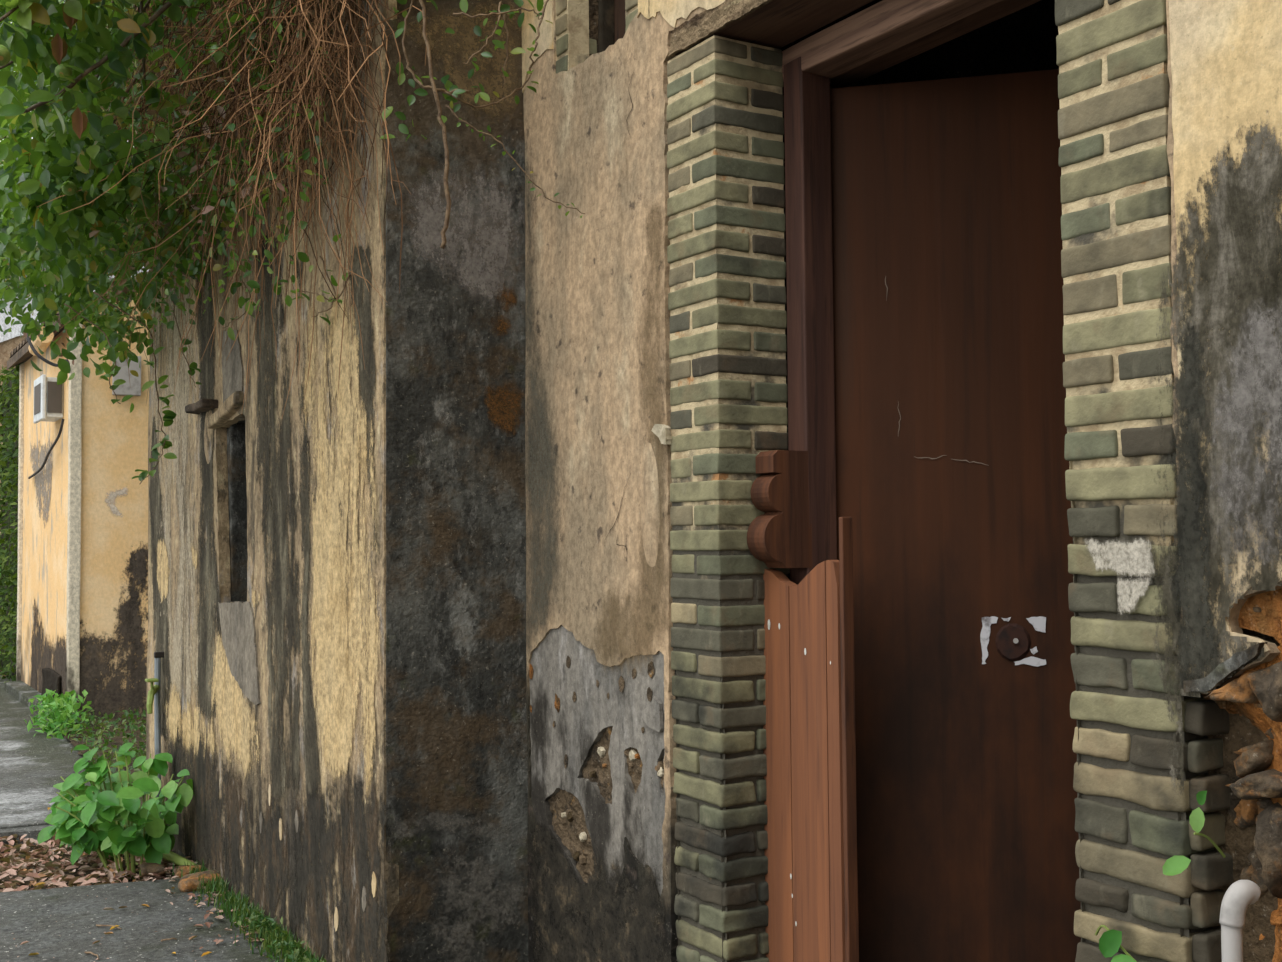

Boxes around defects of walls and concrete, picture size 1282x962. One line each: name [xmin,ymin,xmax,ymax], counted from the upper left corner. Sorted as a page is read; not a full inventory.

water stain [30,233,512,962]
water stain [410,169,559,645]
water stain [434,823,673,962]
peeling [529,626,666,895]
water stain [598,211,667,662]
water stain [1151,111,1282,793]
flaking render [1183,588,1282,962]